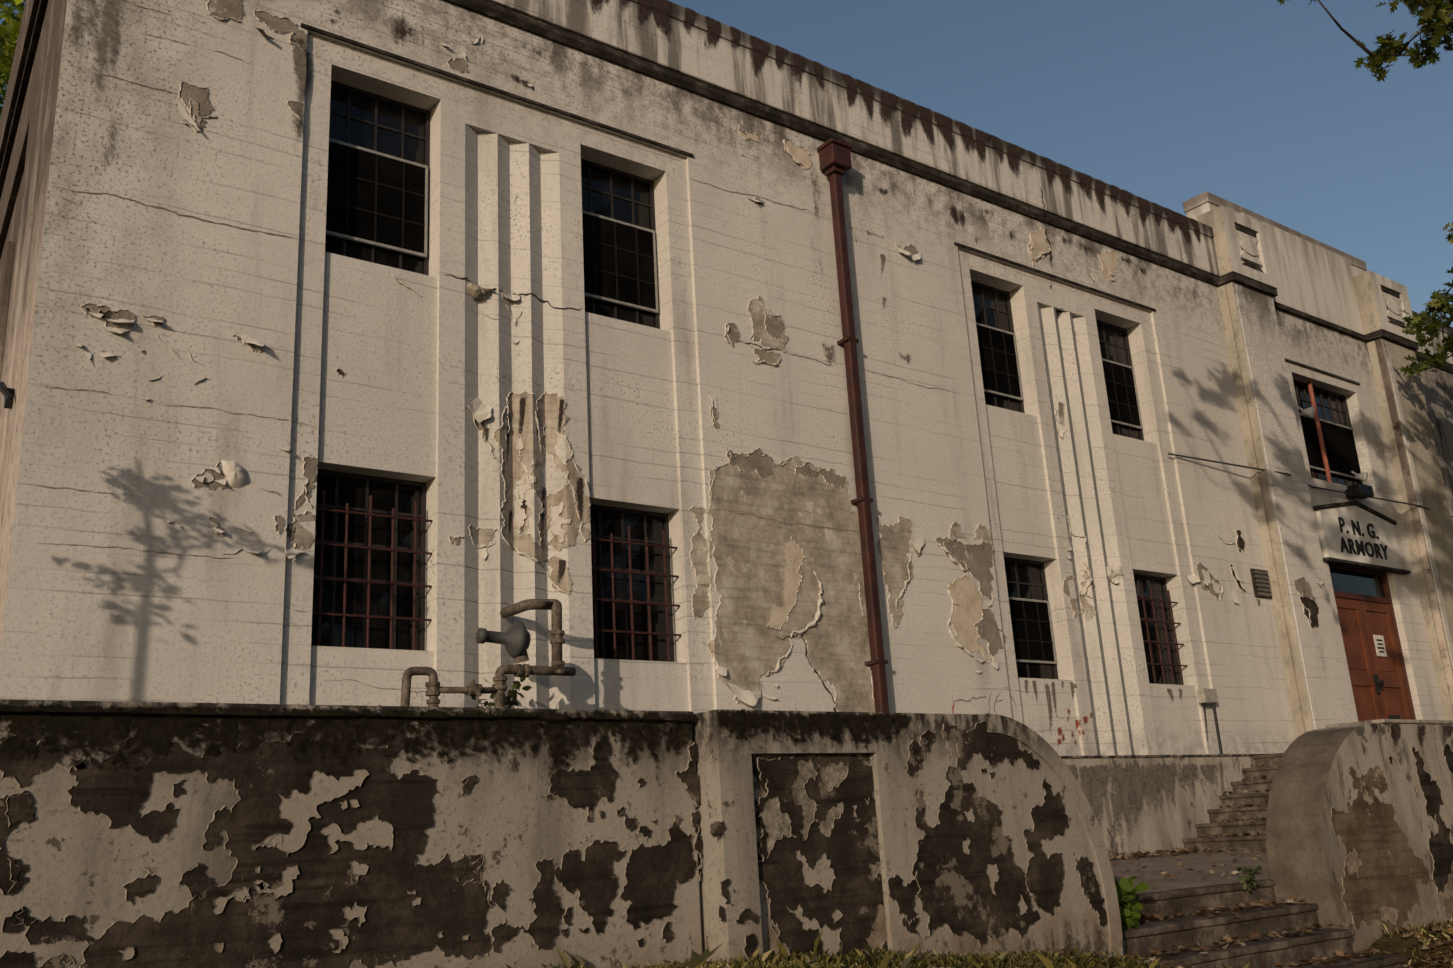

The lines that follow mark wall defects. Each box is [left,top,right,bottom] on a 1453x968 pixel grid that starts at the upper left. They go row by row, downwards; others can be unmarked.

leakage [70,0,124,98]
leakage [292,39,312,137]
leakage [391,19,423,44]
leakage [591,0,824,90]
leakage [843,74,1201,244]
crack [443,274,582,310]
peeling [191,447,319,559]
peeling [448,391,591,595]
peeling [688,447,1006,712]
peeling [0,731,726,968]
peeling [718,721,1108,960]
peeling [1330,723,1453,933]